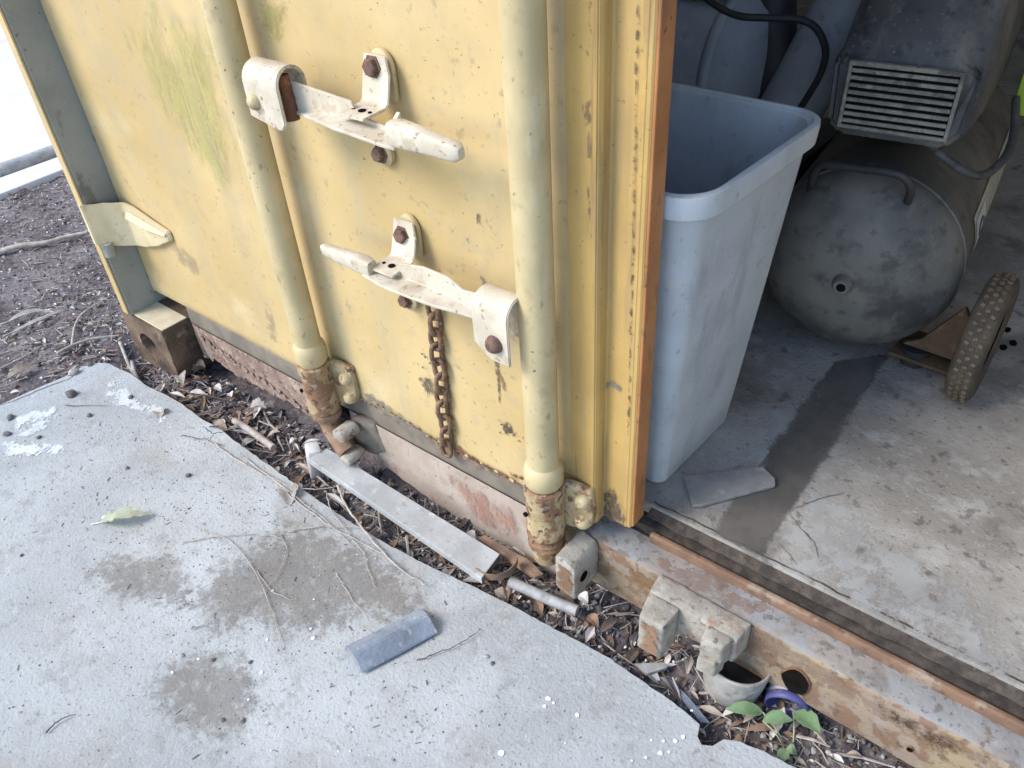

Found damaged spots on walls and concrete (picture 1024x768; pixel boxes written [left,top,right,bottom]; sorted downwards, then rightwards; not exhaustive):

rust [192,324,311,416]
water stain [715,355,888,553]
rust [629,569,654,590]
rust [640,621,659,657]
rust [880,705,958,756]